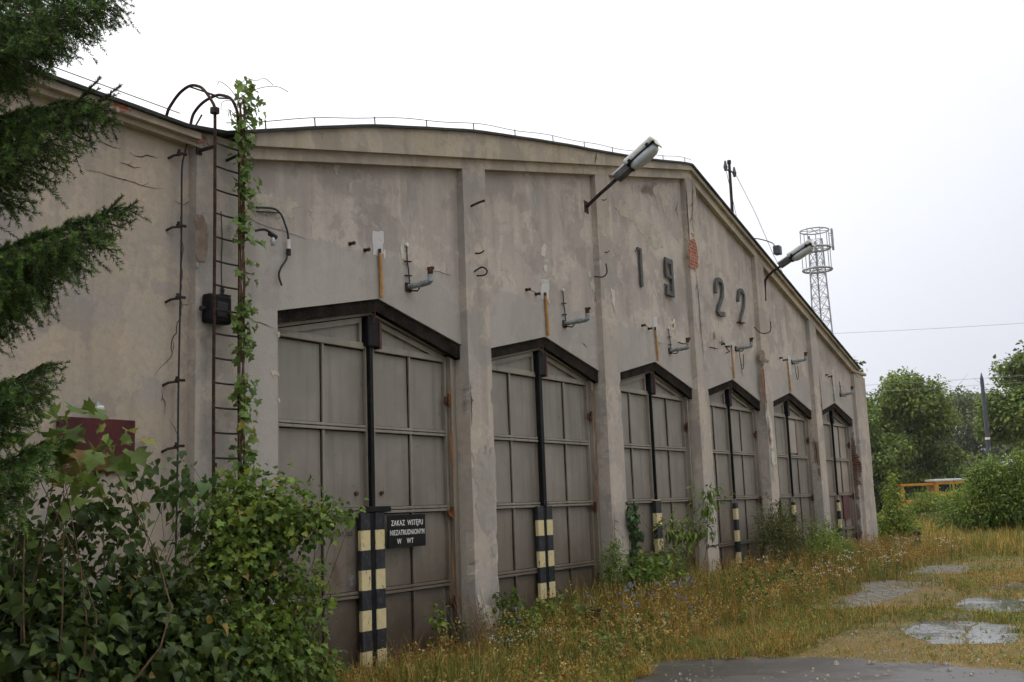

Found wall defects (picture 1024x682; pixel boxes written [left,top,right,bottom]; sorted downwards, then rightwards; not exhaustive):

crack [89,141,156,188]
flaking render [684,234,699,271]
flaking render [851,433,862,541]